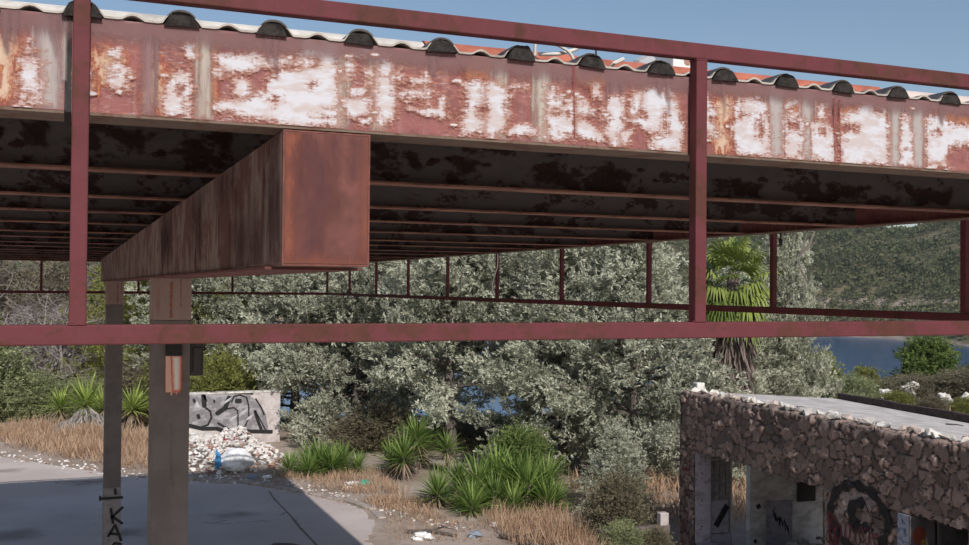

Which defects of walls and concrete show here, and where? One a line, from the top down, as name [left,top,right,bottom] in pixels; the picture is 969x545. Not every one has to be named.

rust [0,29,24,105]
rust [0,120,50,150]
peeling [10,37,49,108]
peeling [90,43,137,96]
rust [90,44,170,117]
rust [209,45,220,119]
peeling [155,42,686,152]
rust [709,92,736,155]
peeling [707,91,969,170]
rust [927,111,969,125]
rust [268,132,378,264]
rust [904,183,953,206]